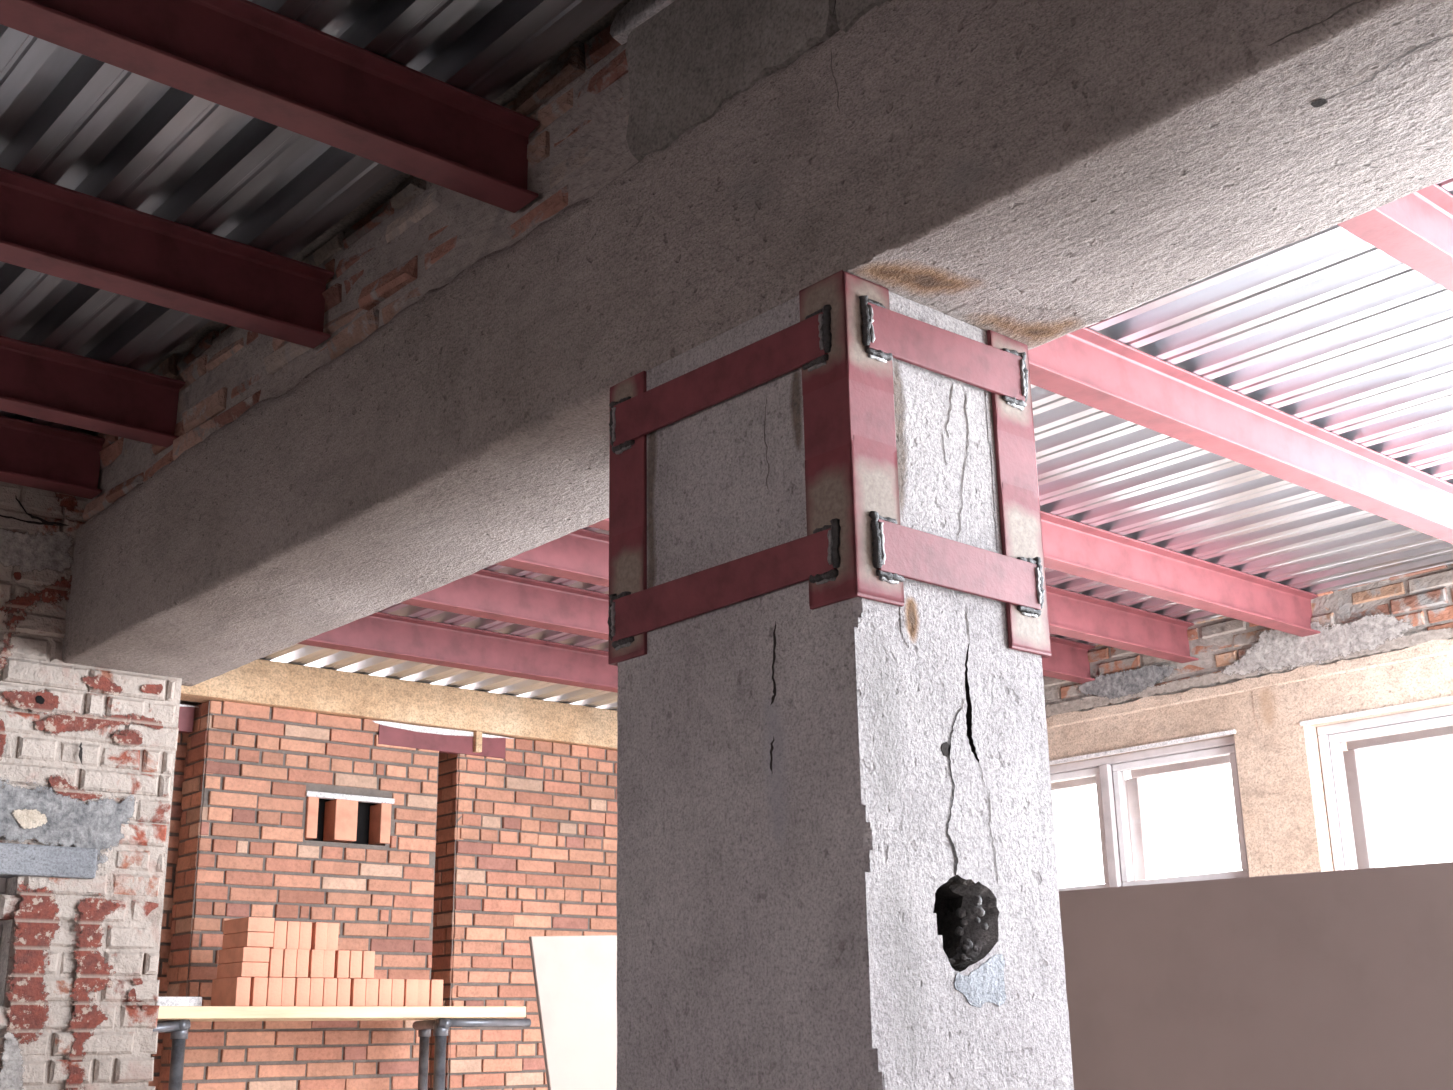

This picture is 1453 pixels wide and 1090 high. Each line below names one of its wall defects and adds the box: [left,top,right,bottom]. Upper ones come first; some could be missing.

rust [846,248,1109,350]
crack [942,384,969,535]
rust [900,588,925,650]
flaking render [13,809,48,829]
peeling [49,774,102,801]
peeling [0,689,163,761]
peeling [82,675,123,696]
peeling [141,684,163,695]
crack [769,622,777,771]
crack [941,609,998,883]
peeling [5,881,148,1090]
spalling [933,875,1006,1008]